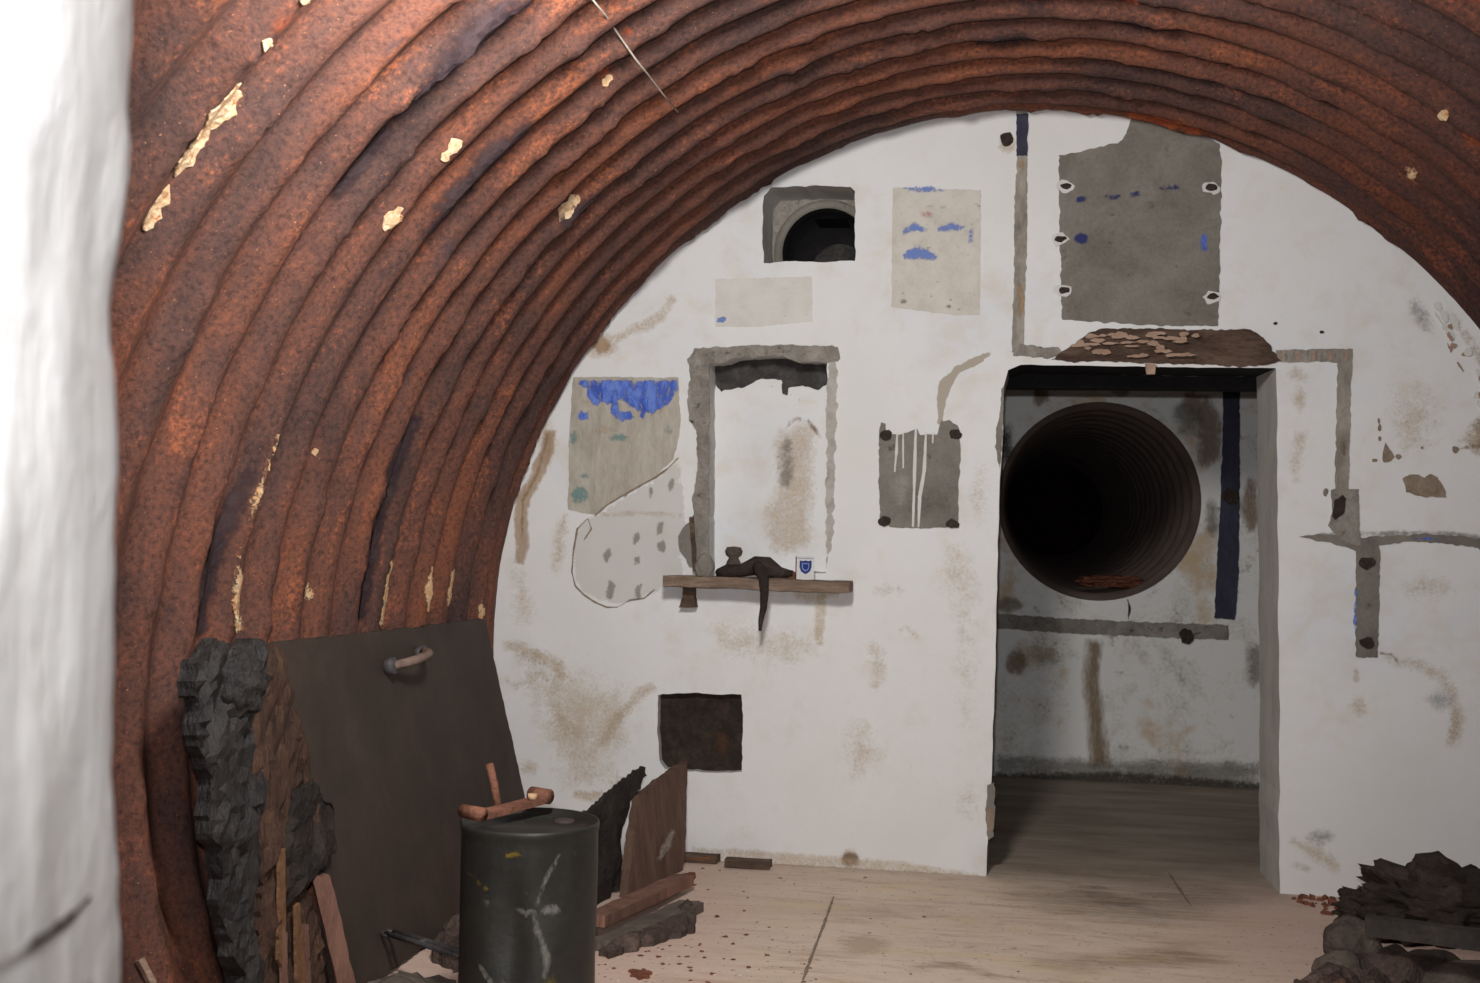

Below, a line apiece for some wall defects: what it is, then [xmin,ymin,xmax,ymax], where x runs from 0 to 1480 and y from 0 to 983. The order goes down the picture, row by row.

peeling [142,83,243,231]
rust [262,38,273,52]
rust [333,0,526,195]
rust [560,197,597,228]
rust [597,68,613,86]
peeling [715,276,813,327]
peeling [1052,119,1222,358]
rust [358,416,422,619]
peeling [567,344,840,567]
peeling [878,420,962,529]
damp [1243,485,1258,529]
damp [995,643,1259,789]